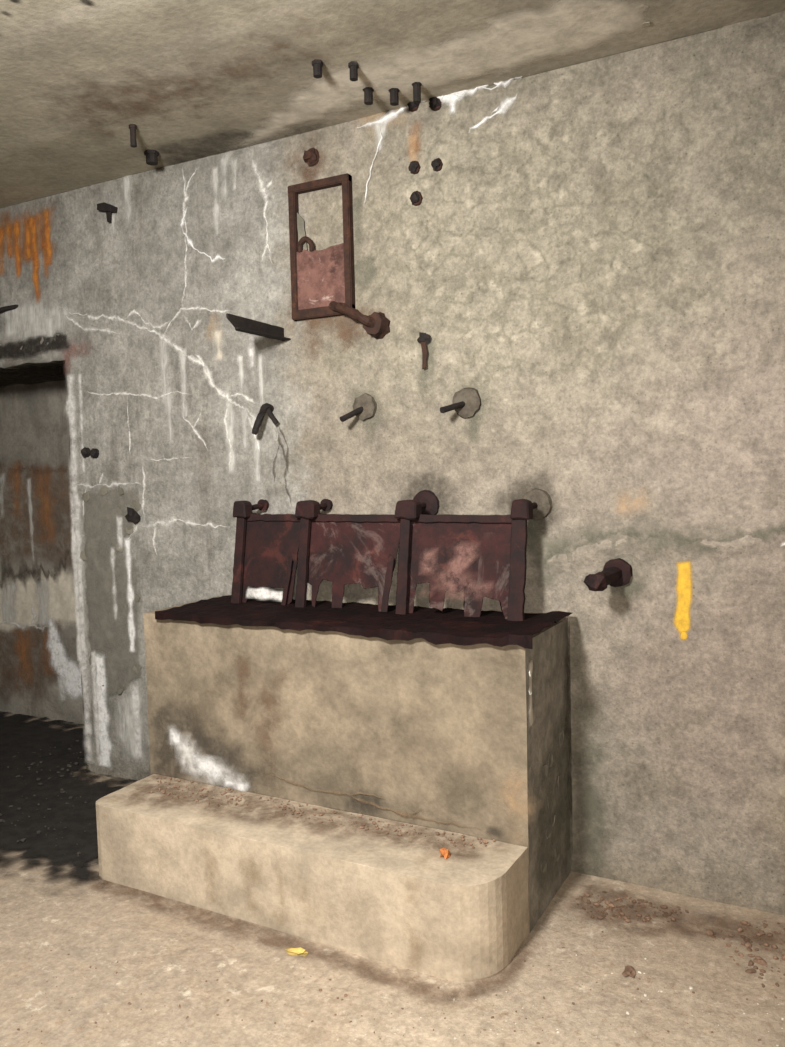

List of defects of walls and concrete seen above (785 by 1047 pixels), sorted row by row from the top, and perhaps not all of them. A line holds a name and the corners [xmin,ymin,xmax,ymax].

crack [437,78,516,128]
crack [357,105,408,198]
rust [0,210,51,299]
crack [61,160,289,552]
water stain [0,374,143,767]
water stain [157,711,252,791]